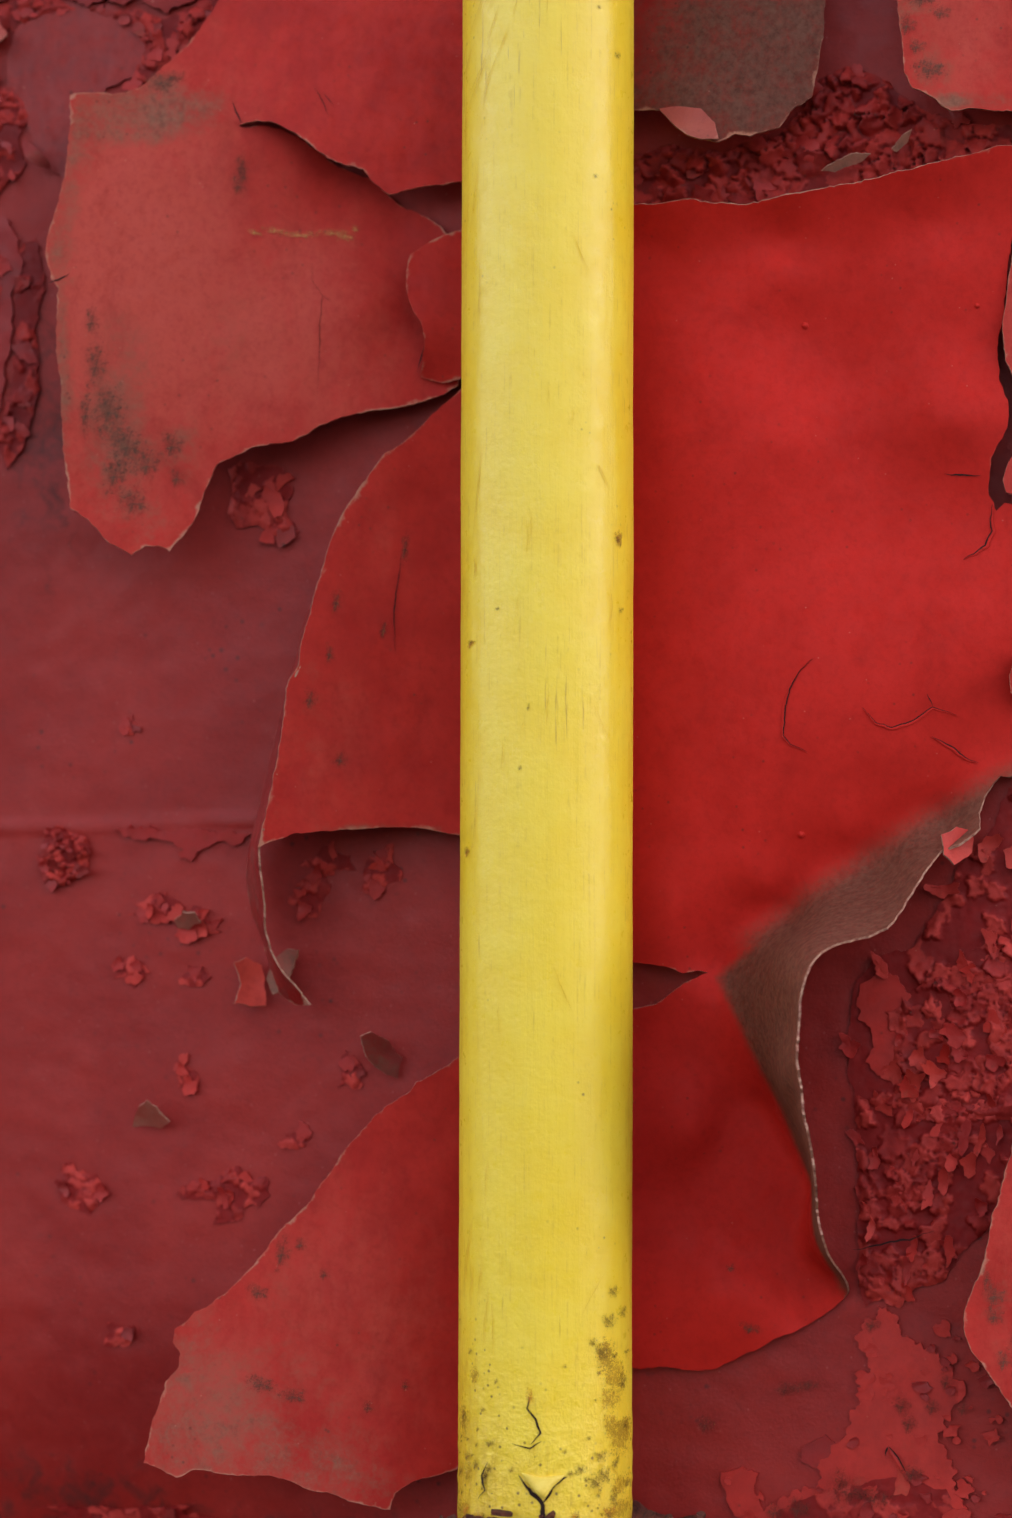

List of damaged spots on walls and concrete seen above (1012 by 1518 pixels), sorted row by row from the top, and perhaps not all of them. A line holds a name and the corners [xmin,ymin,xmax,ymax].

peeling [0,0,463,1007]
peeling [632,0,1012,1408]
peeling [144,1031,459,1510]